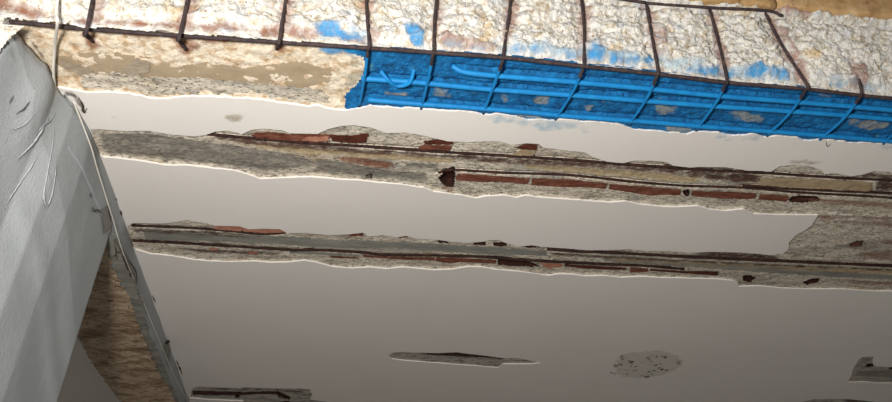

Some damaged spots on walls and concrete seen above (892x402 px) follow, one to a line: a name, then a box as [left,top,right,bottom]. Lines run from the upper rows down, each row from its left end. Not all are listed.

spalling [0,0,892,143]
spalling [78,125,892,402]